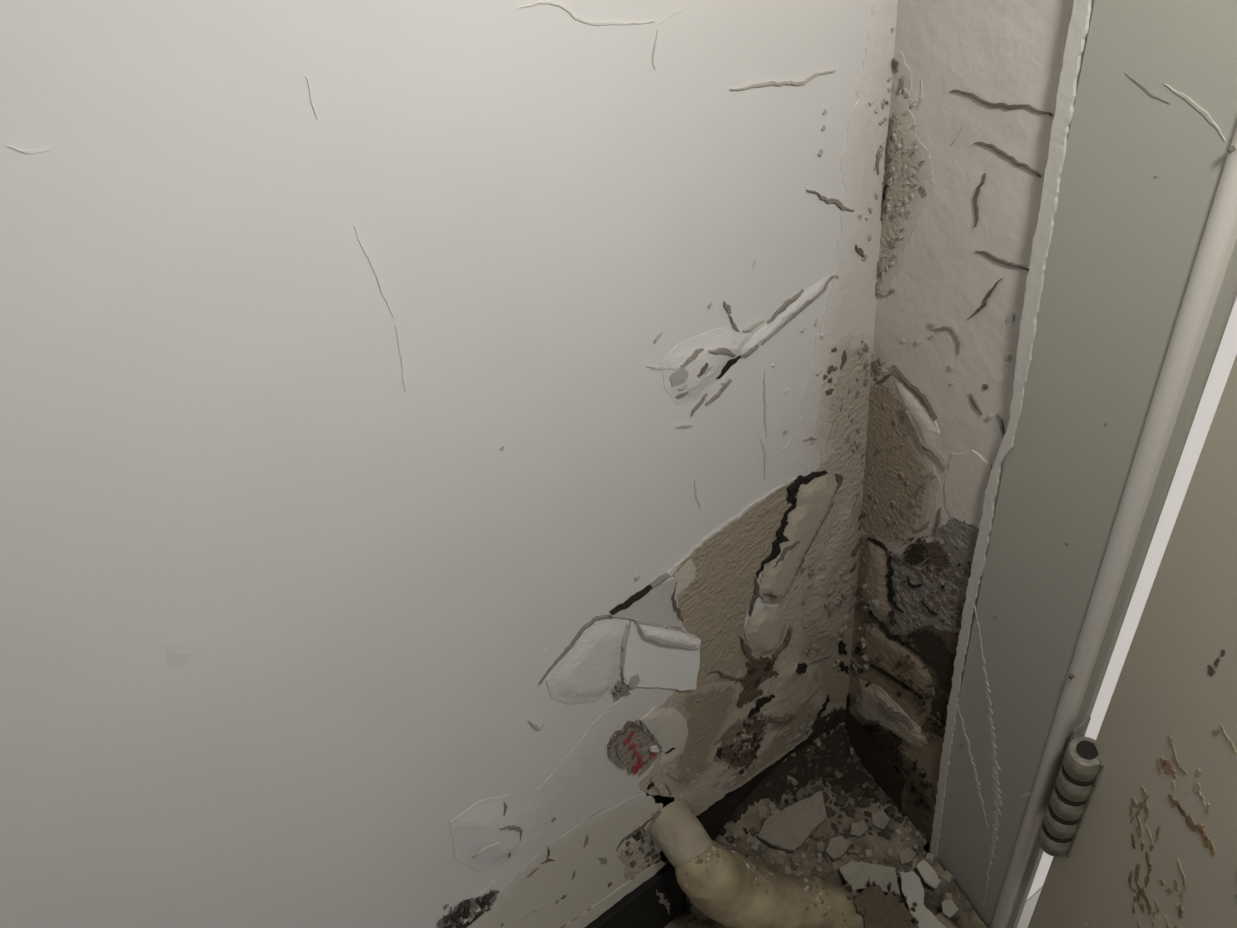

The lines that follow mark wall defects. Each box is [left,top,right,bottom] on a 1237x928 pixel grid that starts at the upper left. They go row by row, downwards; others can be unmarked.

crack [730,70,836,90]
crack [891,58,1053,117]
crack [929,127,1042,355]
crack [538,573,687,685]
peeling [609,477,797,691]
leakage [474,0,971,899]
crack [646,275,844,746]
crack [875,365,948,499]
flaking render [890,450,992,635]
flaking render [607,706,688,775]
crack [481,802,589,880]
peeling [436,781,676,928]